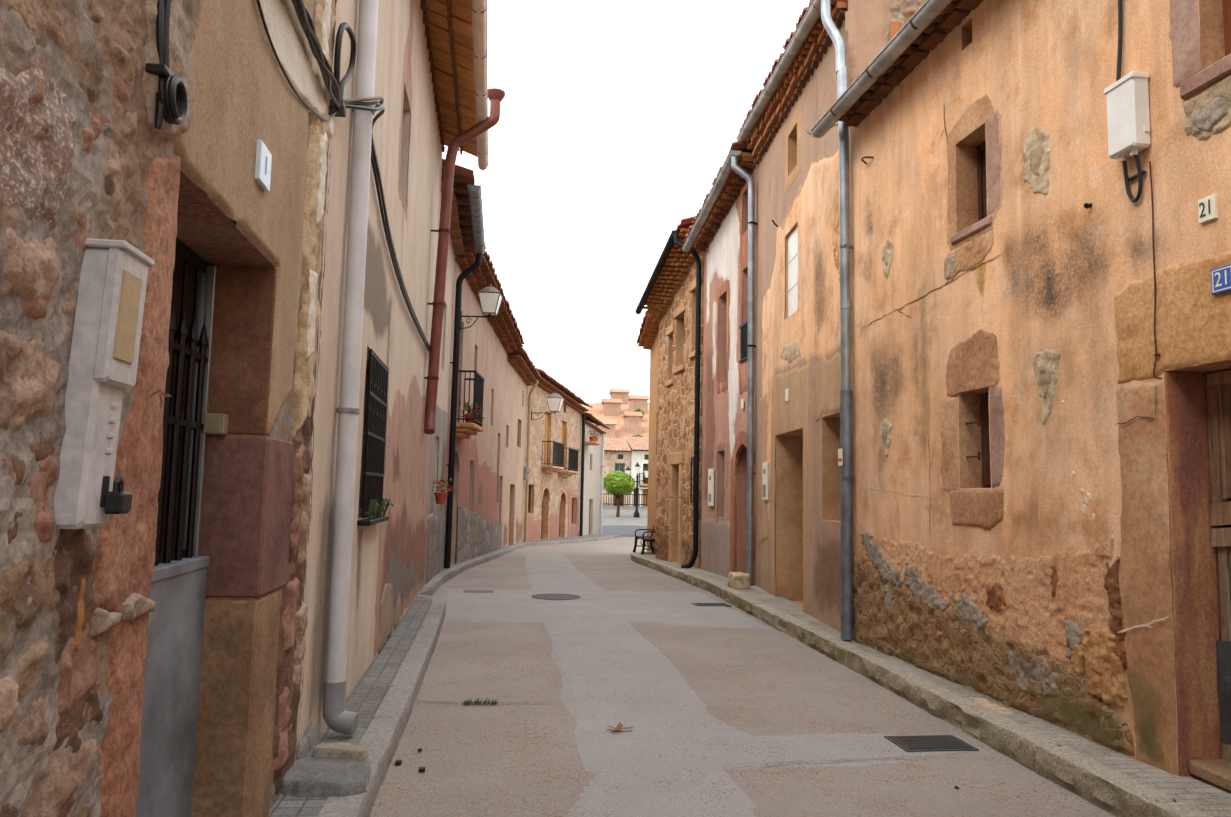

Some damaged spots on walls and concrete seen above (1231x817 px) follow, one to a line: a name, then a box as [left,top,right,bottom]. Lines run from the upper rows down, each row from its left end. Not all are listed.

spalling [1183,75,1231,141]
spalling [1023,127,1051,195]
spalling [1033,348,1064,426]
spalling [853,531,1135,756]